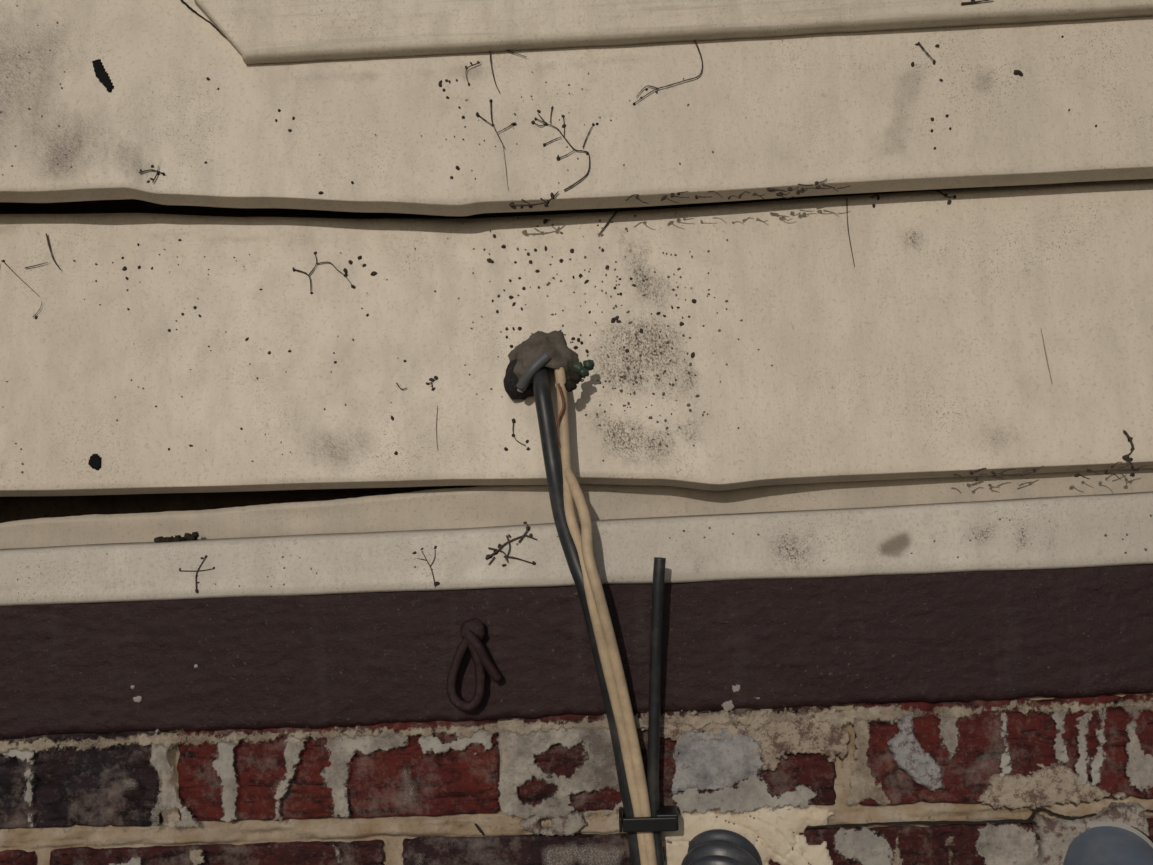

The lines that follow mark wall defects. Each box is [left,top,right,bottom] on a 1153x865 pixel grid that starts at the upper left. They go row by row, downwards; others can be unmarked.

damp [601,324,695,388]
damp [598,416,692,456]
damp [0,714,609,753]
damp [634,704,912,730]
damp [940,696,1153,786]
damp [672,775,816,814]
damp [544,845,621,865]
damp [890,836,903,865]